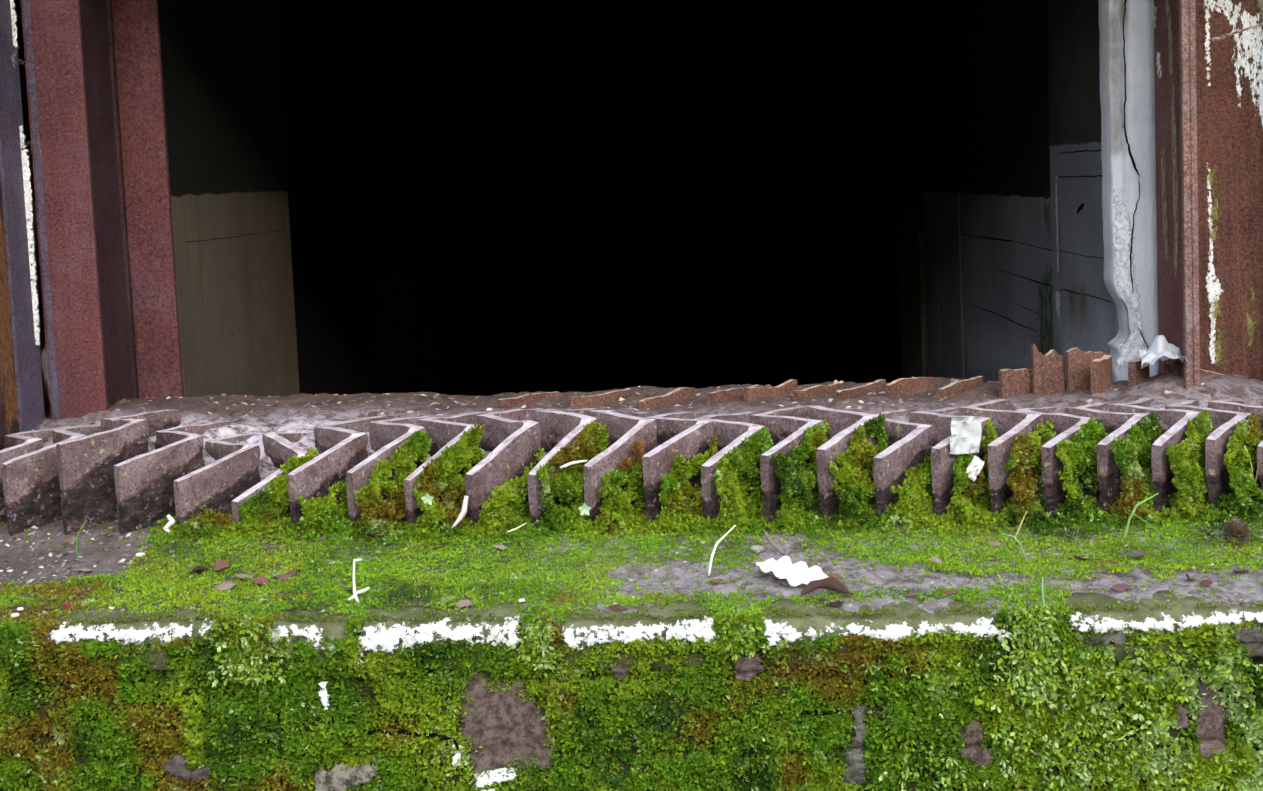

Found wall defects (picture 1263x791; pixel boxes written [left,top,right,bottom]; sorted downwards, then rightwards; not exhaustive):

peeling [1203,0,1263,127]
crack [960,0,1140,332]
corrosion [1160,0,1179,277]
corrosion [0,190,19,431]
spalling [1078,631,1126,646]
spalling [1233,625,1263,659]
spalling [459,671,557,774]